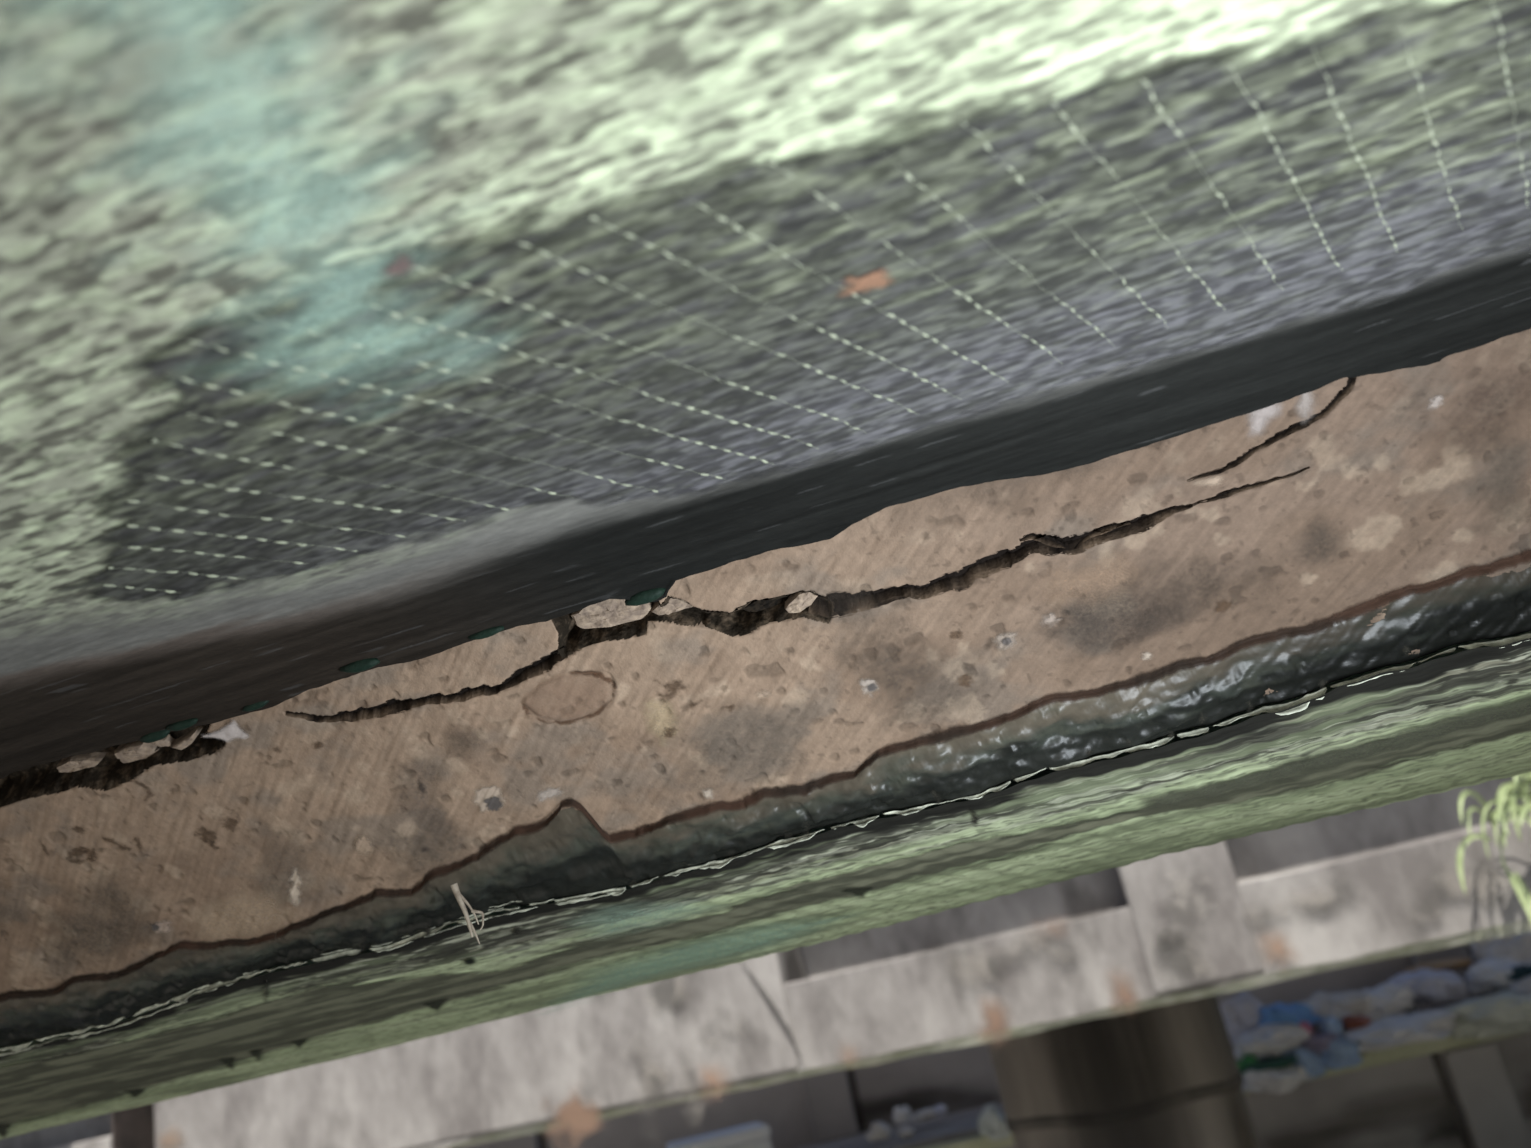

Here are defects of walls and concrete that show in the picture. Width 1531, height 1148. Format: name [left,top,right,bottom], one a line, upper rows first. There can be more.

rust [847,271,887,294]
crack [808,377,1357,619]
crack [286,647,567,723]